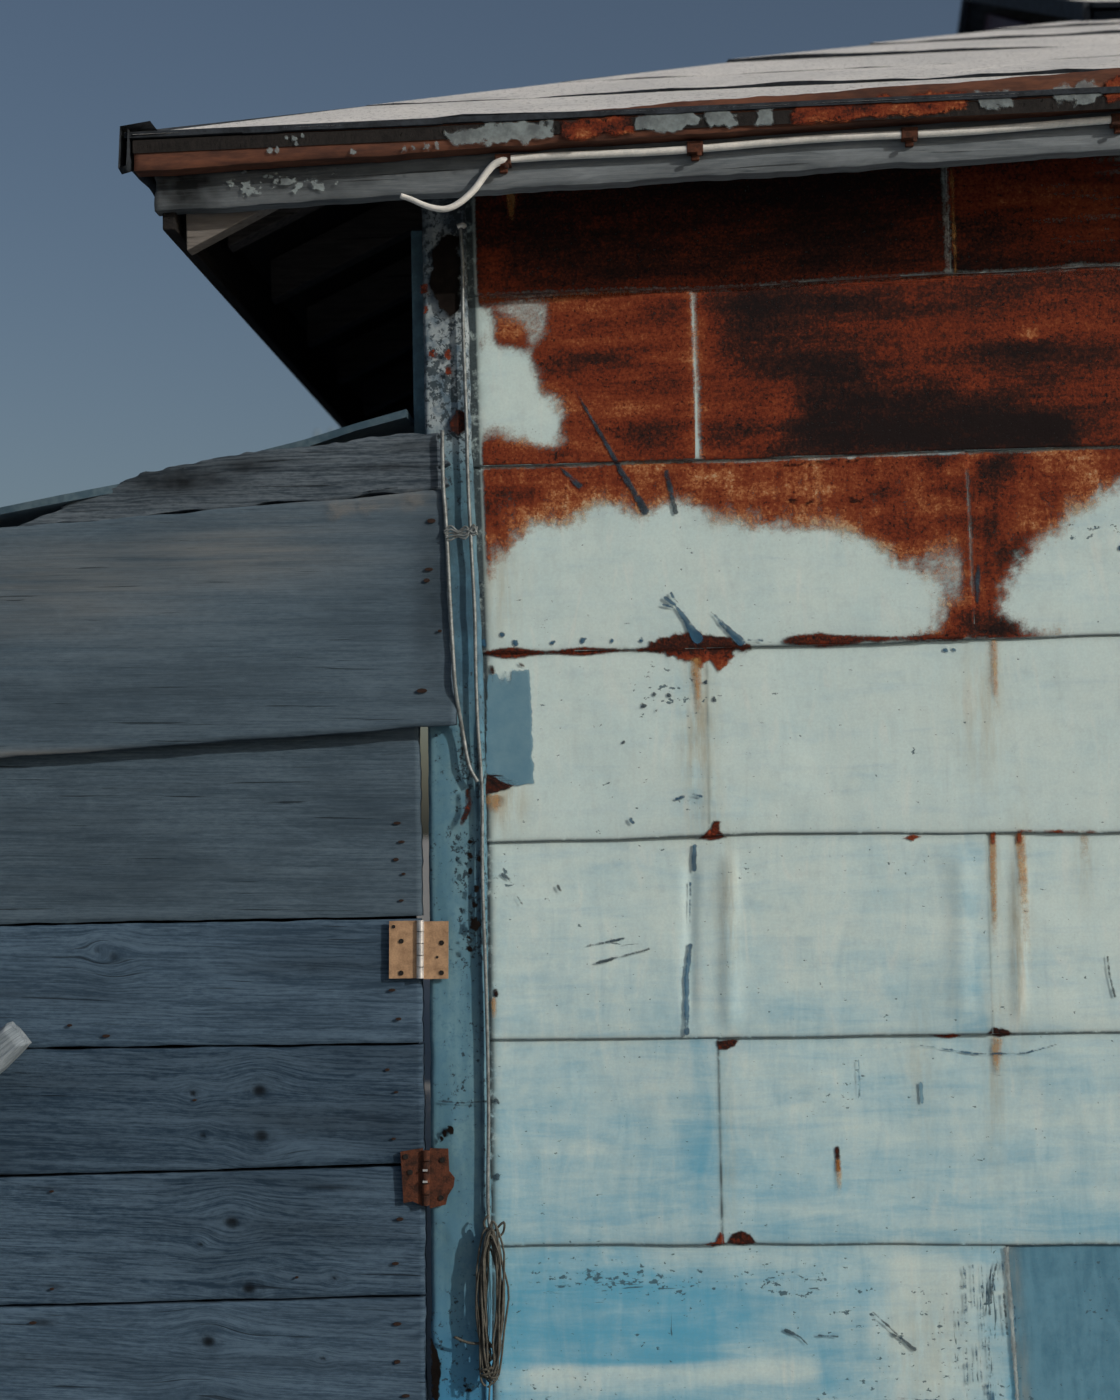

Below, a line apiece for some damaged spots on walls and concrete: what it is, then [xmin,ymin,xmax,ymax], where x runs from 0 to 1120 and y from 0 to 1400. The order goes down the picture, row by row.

peeling [975,90,1013,109]
peeling [1054,80,1102,105]
peeling [403,119,553,150]
peeling [635,111,738,132]
peeling [756,108,773,126]
peeling [429,234,461,317]
rust [450,409,465,435]
rust [475,155,1120,688]
rust [485,632,751,698]
rust [1017,830,1032,891]